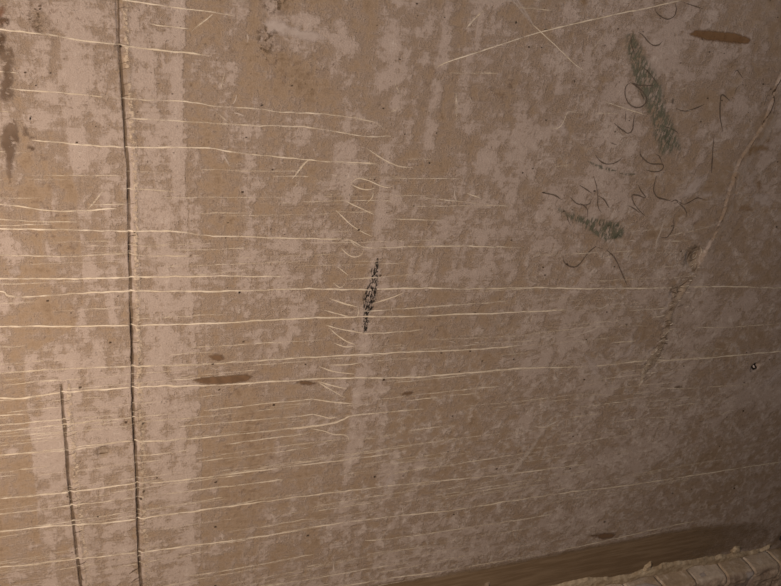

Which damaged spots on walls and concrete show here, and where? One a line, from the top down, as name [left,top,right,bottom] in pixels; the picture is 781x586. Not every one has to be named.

damp [1,123,28,177]
spalling [123,0,146,484]
spalling [552,544,771,586]